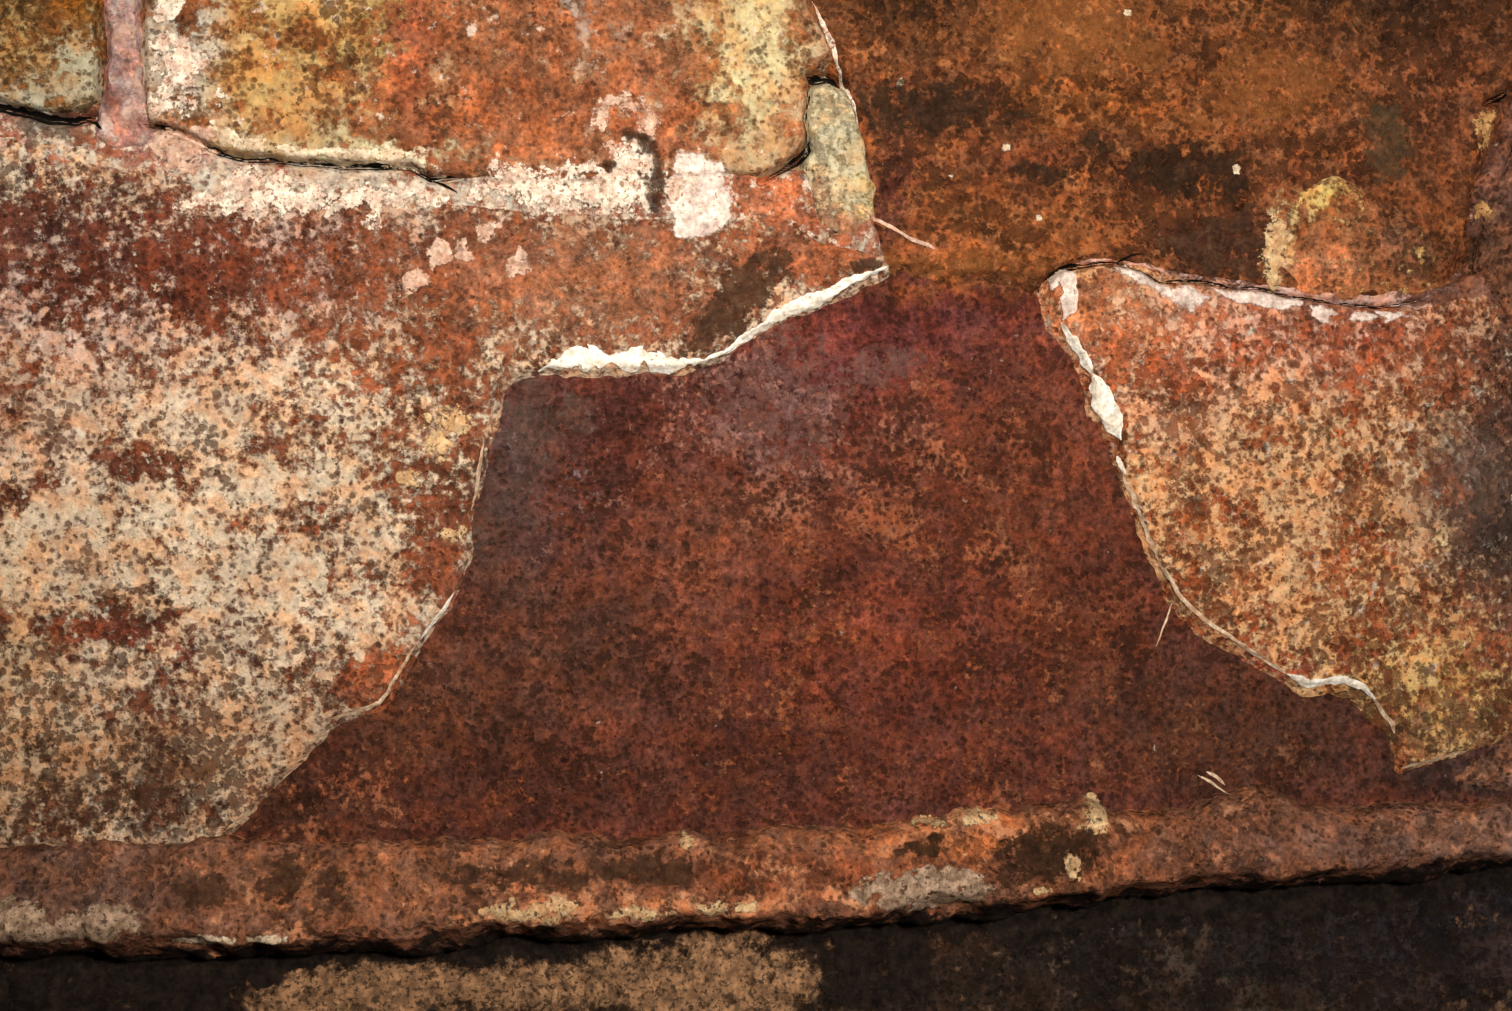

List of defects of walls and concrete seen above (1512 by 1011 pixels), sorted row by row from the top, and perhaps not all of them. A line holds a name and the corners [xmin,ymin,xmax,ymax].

crack [0,104,102,129]
crack [1482,91,1507,106]
crack [142,124,498,193]
spalling [232,265,1512,850]